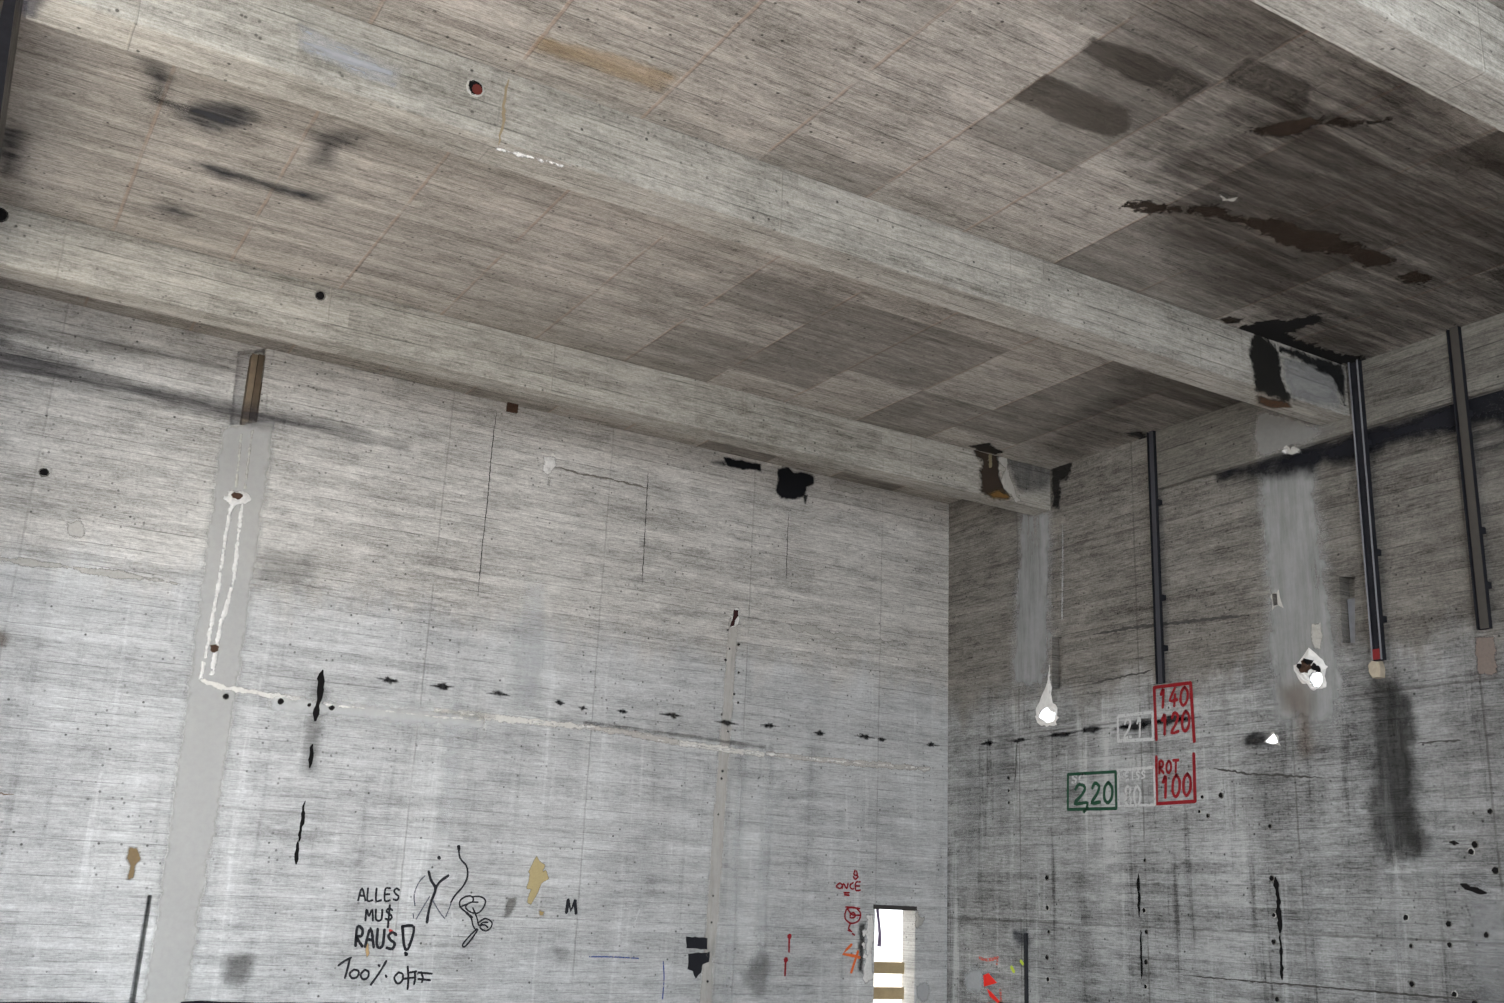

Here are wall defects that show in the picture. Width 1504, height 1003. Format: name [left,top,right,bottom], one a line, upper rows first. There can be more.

leakage [1370,680,1426,858]